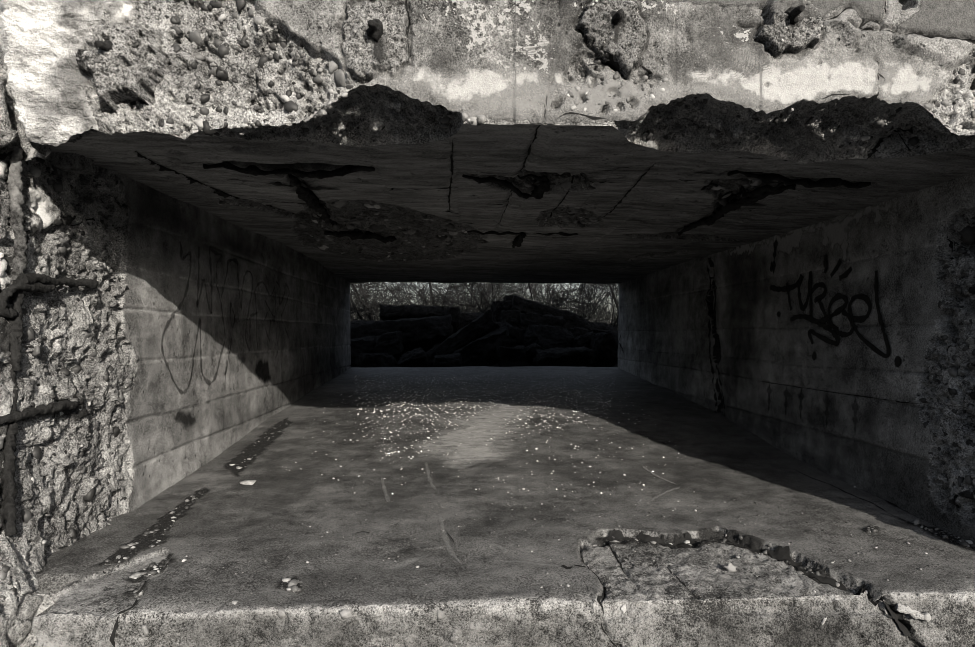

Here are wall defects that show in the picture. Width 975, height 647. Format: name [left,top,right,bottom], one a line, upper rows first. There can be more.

spalling [187,160,364,175]
crack [447,140,455,210]
spalling [83,0,975,164]
crack [500,78,604,222]
crack [548,163,656,218]
corrosion [0,147,98,536]
spalling [0,45,172,647]
crack [705,256,725,417]
spalling [582,527,886,623]
crack [562,529,919,647]